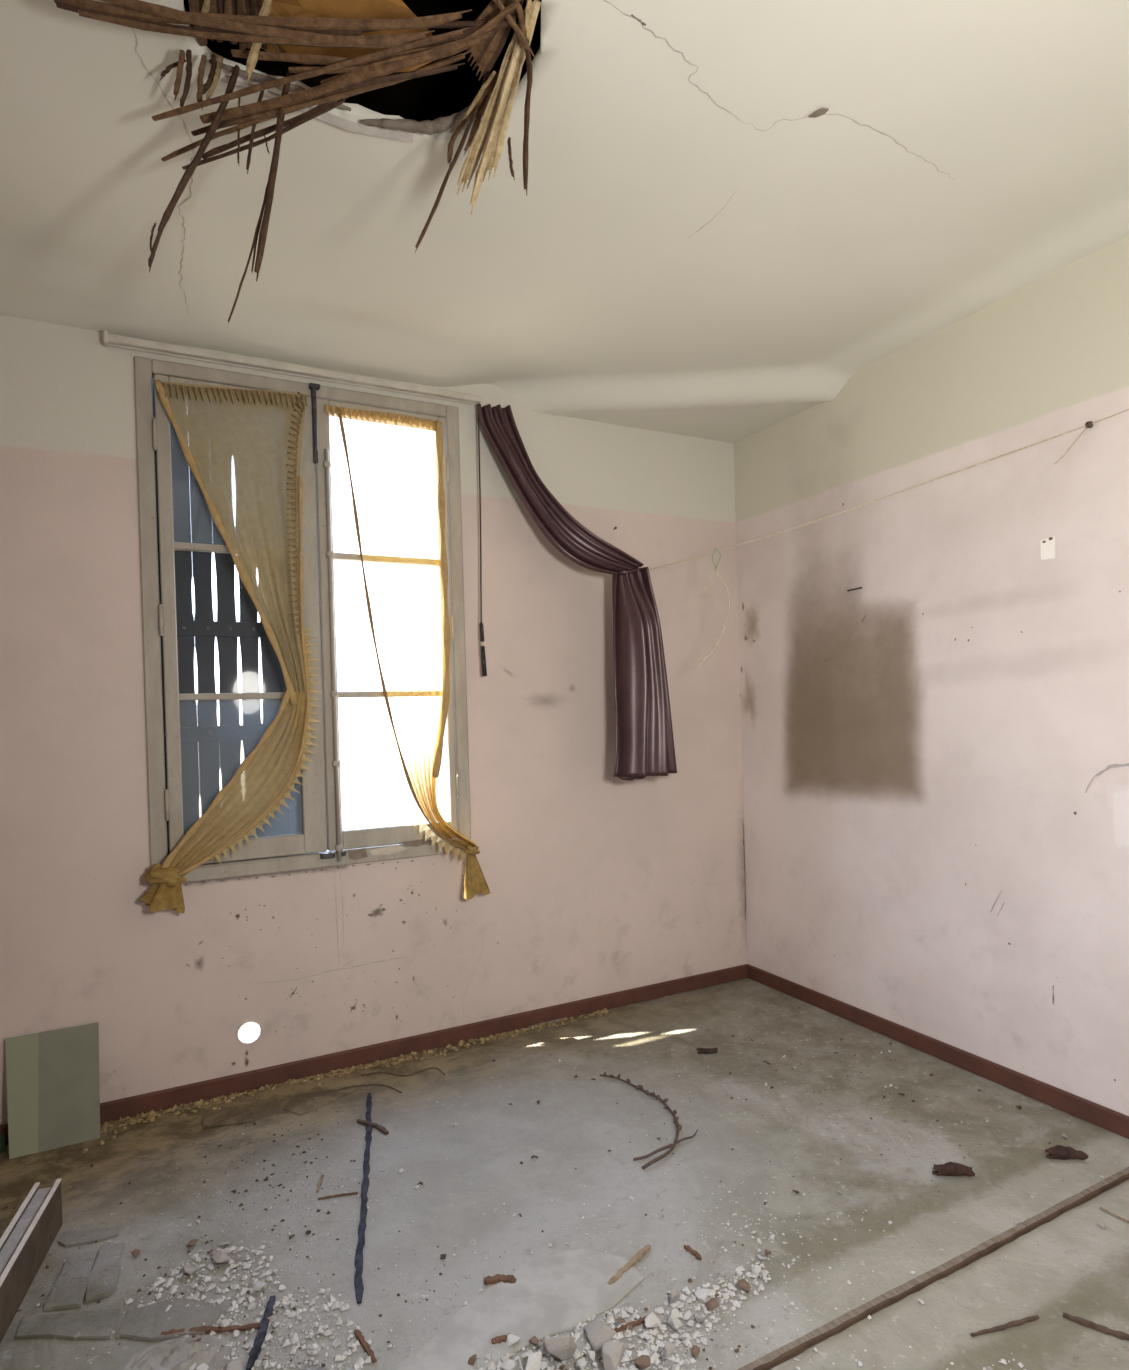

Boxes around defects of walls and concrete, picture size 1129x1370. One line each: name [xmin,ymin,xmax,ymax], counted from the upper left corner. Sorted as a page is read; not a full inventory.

crack [132,28,195,312]
peeling [219,73,281,99]
peeling [298,107,413,143]
crack [603,0,952,179]
damp [790,623,913,789]